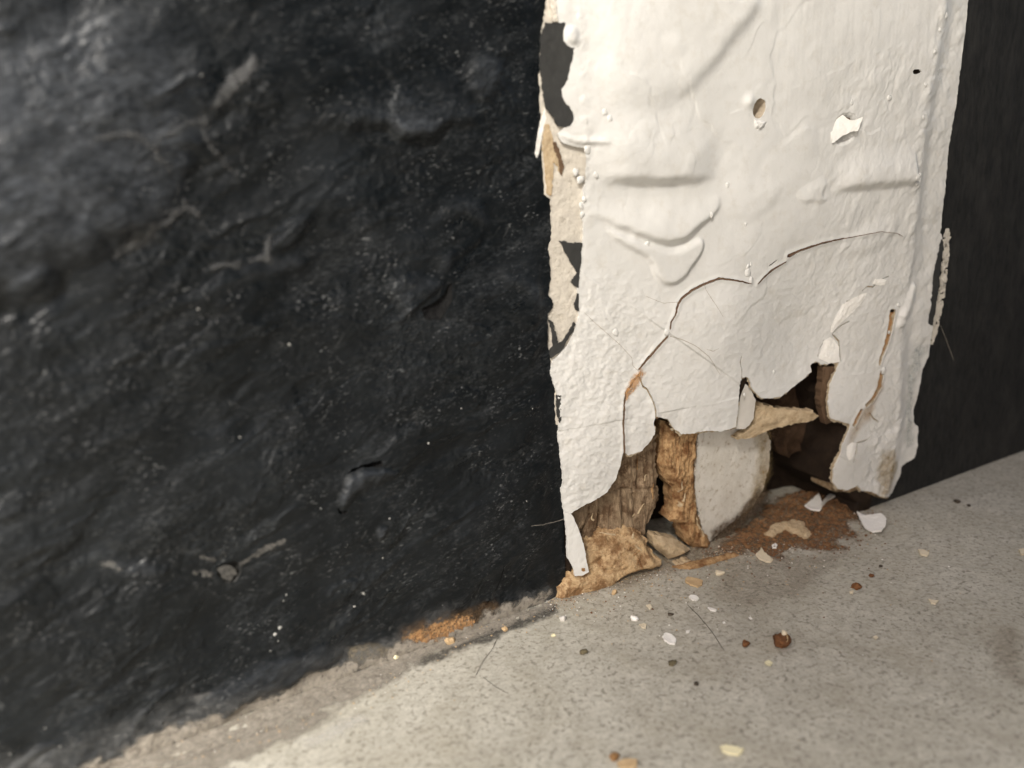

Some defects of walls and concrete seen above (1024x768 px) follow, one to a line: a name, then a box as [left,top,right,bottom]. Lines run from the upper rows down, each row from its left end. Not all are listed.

spalling [548,0,558,22]
peeling [535,110,564,195]
crack [585,231,903,453]
peeling [846,442,856,460]
peeling [694,429,771,541]
spalling [805,477,888,511]
peeling [756,543,777,563]